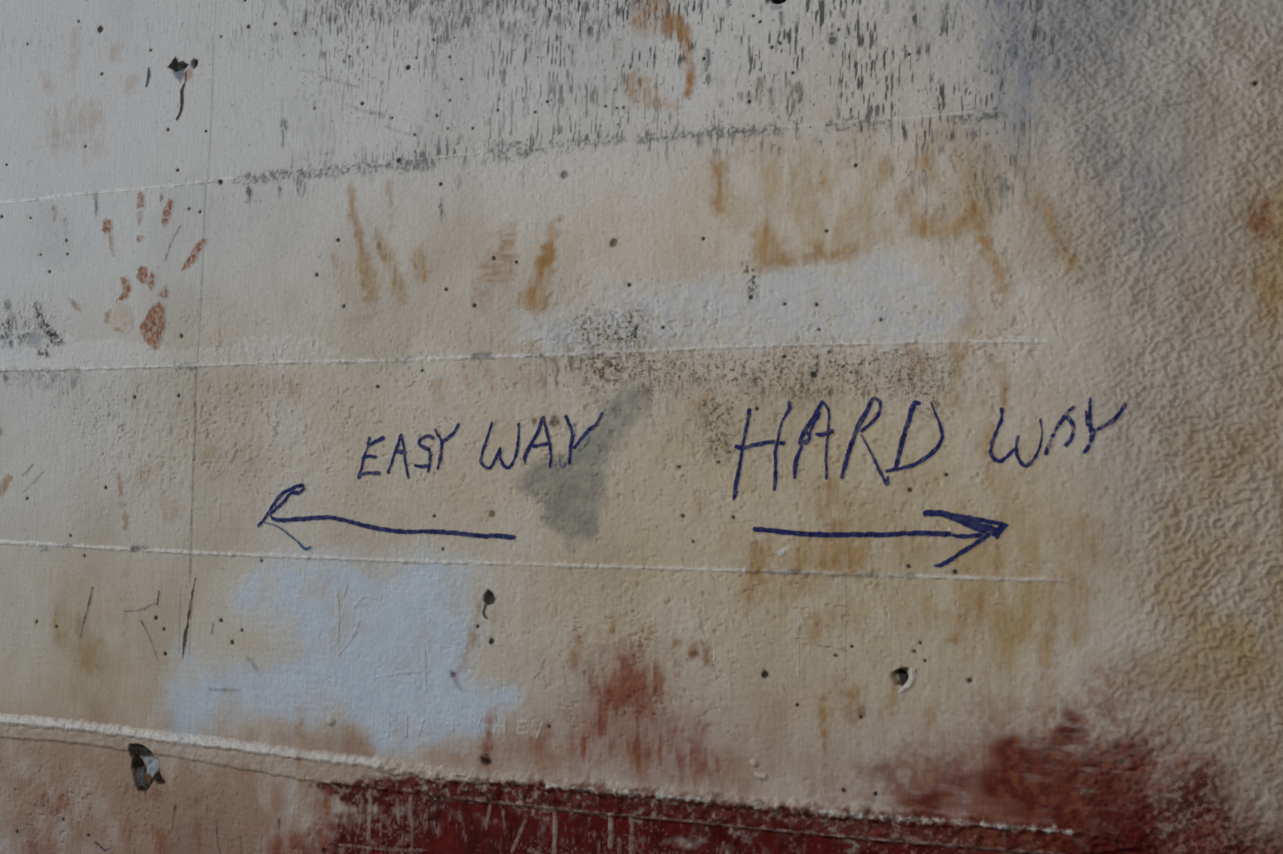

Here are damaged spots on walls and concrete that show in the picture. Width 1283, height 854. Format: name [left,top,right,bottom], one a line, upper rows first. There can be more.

rust [615,0,698,115]
spalling [127,742,166,794]